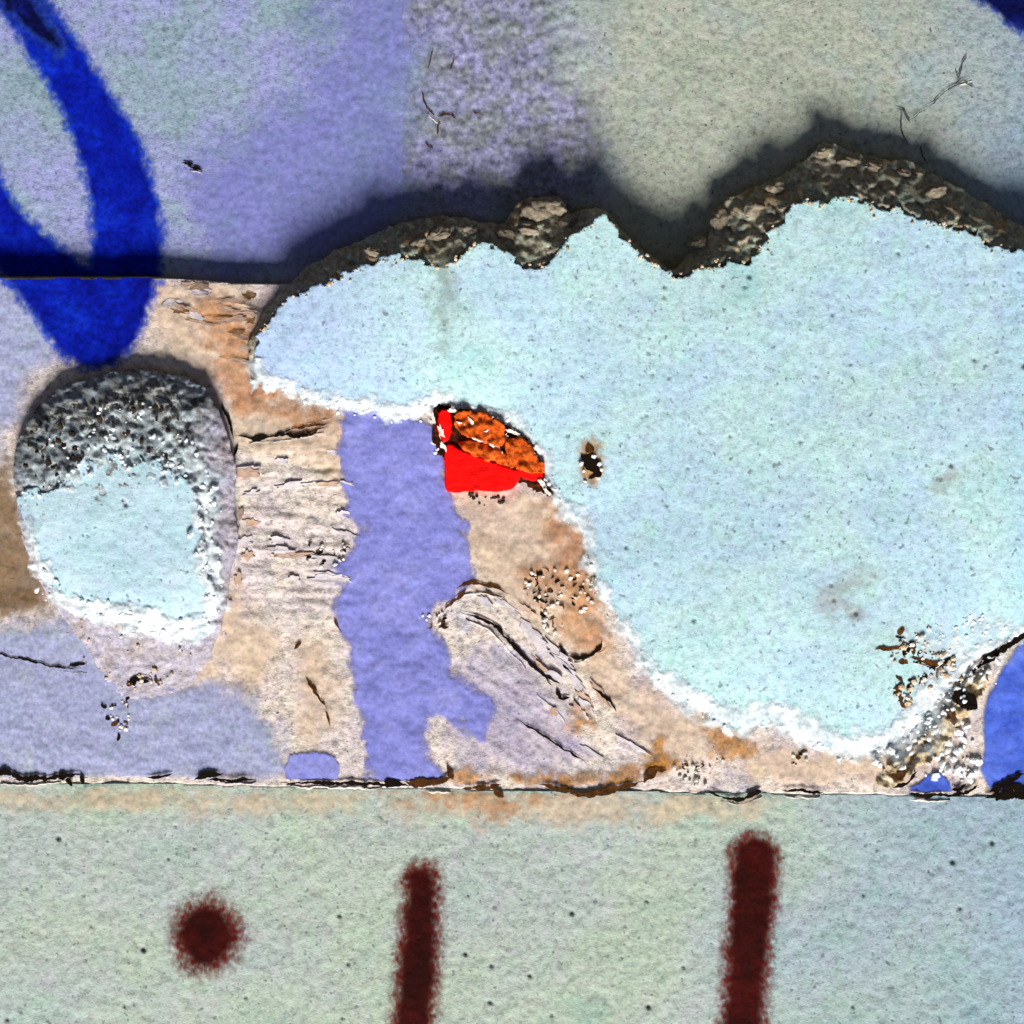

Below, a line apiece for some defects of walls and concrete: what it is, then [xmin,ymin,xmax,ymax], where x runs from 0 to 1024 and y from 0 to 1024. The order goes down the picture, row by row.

spalling [160,142,1024,789]
spalling [13,369,260,741]
crack [443,579,616,711]
crack [0,653,86,673]
crack [517,719,584,761]
crack [0,768,88,787]
crack [147,767,504,798]
crack [539,767,666,798]
crack [709,788,827,805]
crack [909,773,1024,802]